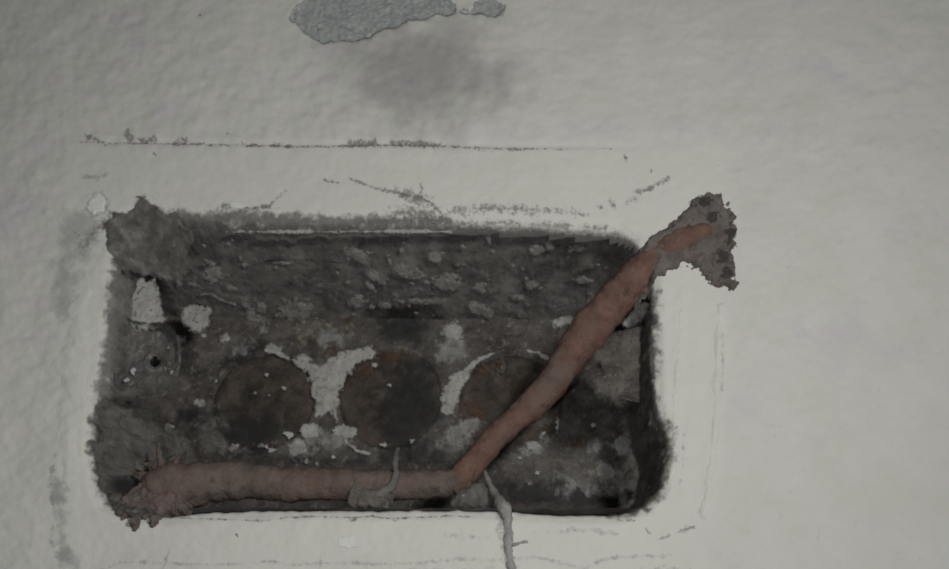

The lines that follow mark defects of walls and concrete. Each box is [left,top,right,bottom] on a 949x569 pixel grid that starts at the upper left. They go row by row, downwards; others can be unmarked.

peeling [289,0,506,44]